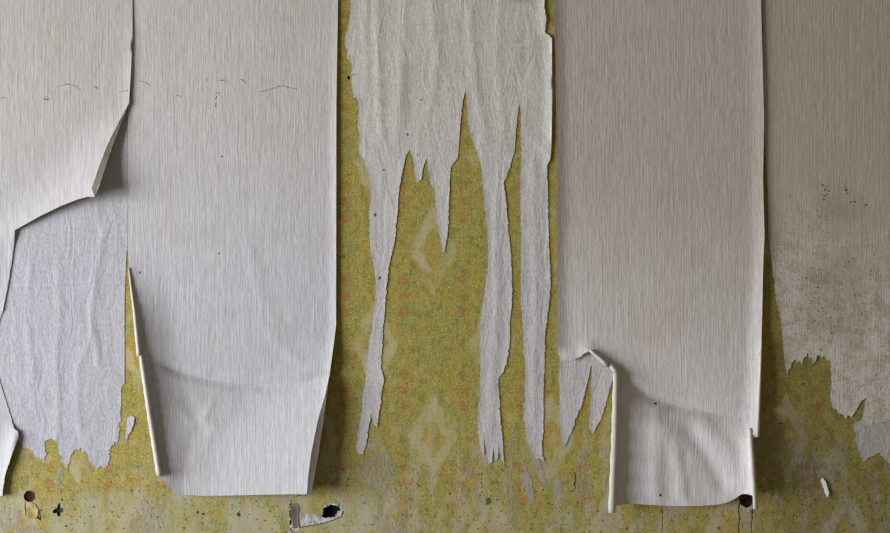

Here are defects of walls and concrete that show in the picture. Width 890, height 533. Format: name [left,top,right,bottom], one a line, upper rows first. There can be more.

peeling [0,0,344,533]
peeling [554,0,890,513]